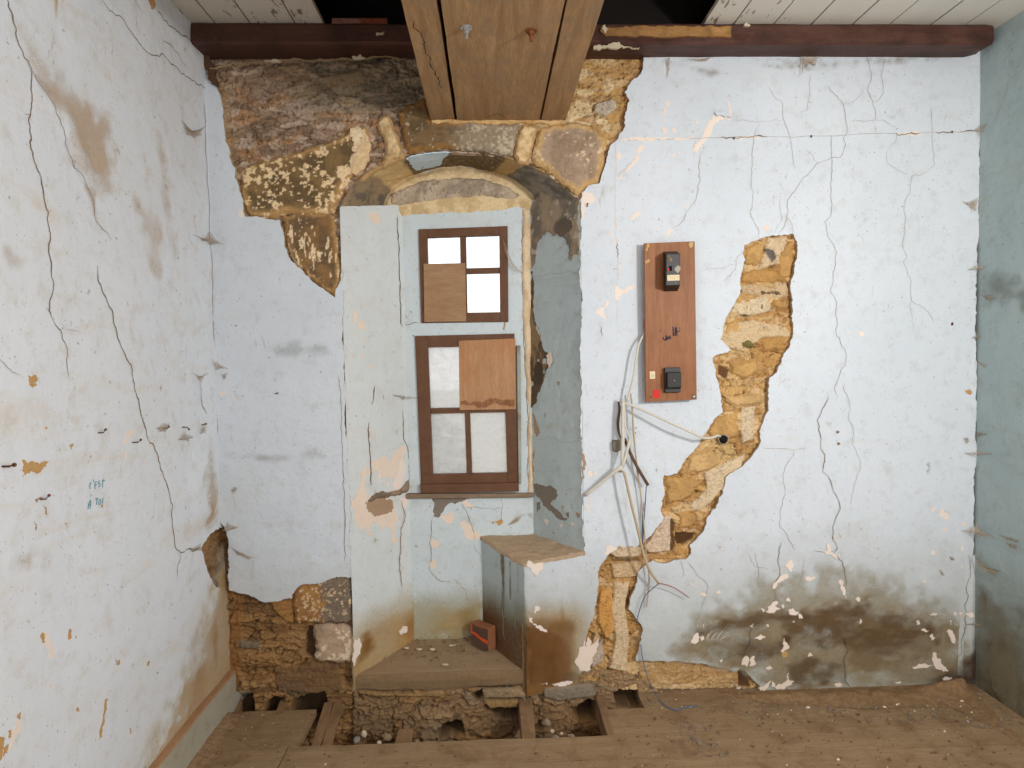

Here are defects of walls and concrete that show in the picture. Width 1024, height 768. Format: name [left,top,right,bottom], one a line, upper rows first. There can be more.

crack [8,1,110,374]
crack [97,266,199,575]
crack [102,0,213,305]
spalling [201,526,362,746]
peeling [351,445,409,544]
spalling [211,25,645,437]
peeling [432,498,481,540]
spalling [544,225,803,691]
peeling [692,101,732,152]
crack [618,57,1016,602]
leakage [675,554,1024,718]